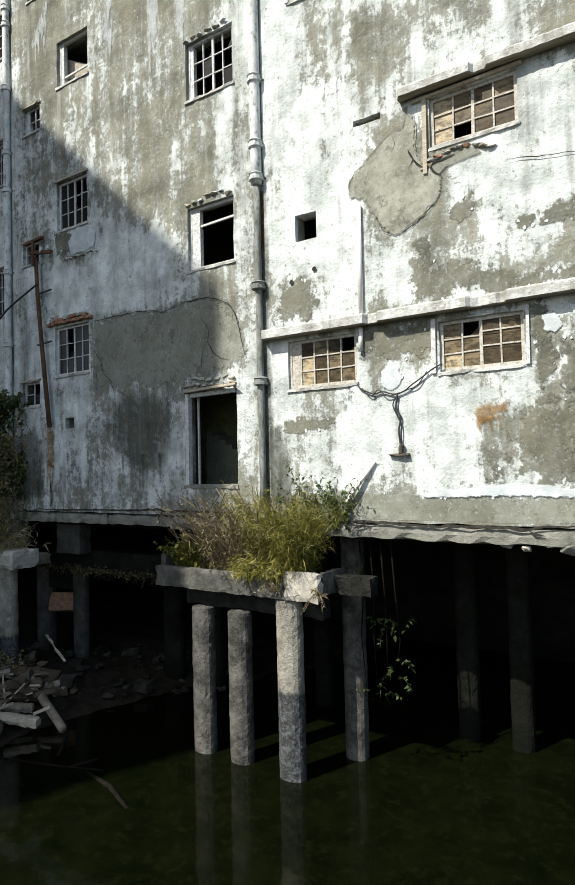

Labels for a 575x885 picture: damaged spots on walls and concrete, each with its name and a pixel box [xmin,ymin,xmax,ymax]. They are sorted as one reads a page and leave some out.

leakage [32,2,47,61]
leakage [101,0,112,52]
leakage [147,0,160,71]
leakage [176,0,184,42]
crack [512,151,575,159]
peeling [515,195,575,230]
peeling [408,235,575,301]
peeling [277,273,320,326]
crack [92,297,246,368]
peeling [274,299,575,525]
rust [475,402,507,430]
rust [45,424,54,483]